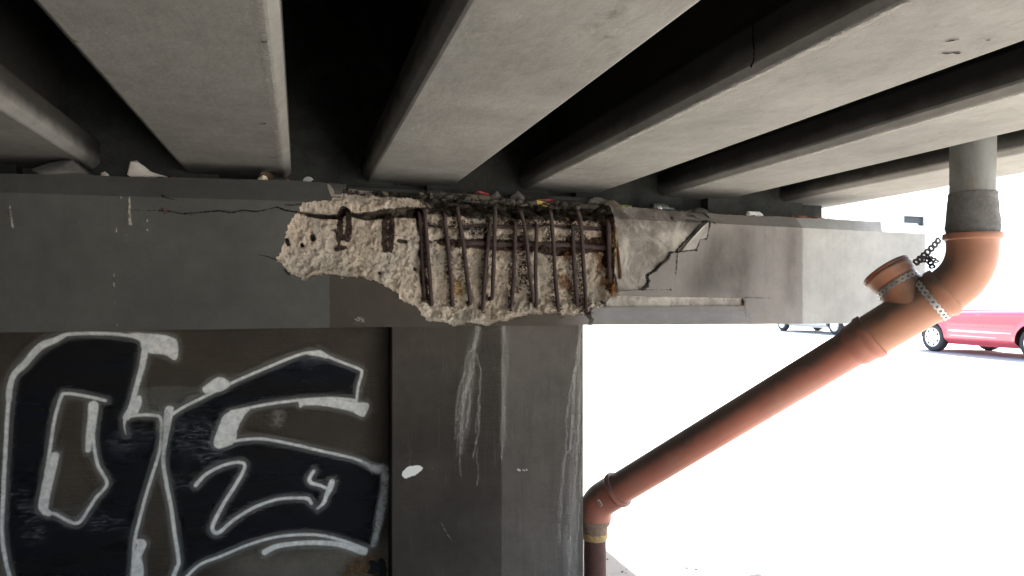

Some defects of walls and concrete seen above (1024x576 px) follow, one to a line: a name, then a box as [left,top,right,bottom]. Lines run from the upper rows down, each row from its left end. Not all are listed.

crack [148,195,302,215]
spalling [276,184,747,326]
rust [413,207,619,318]
crack [640,221,716,291]